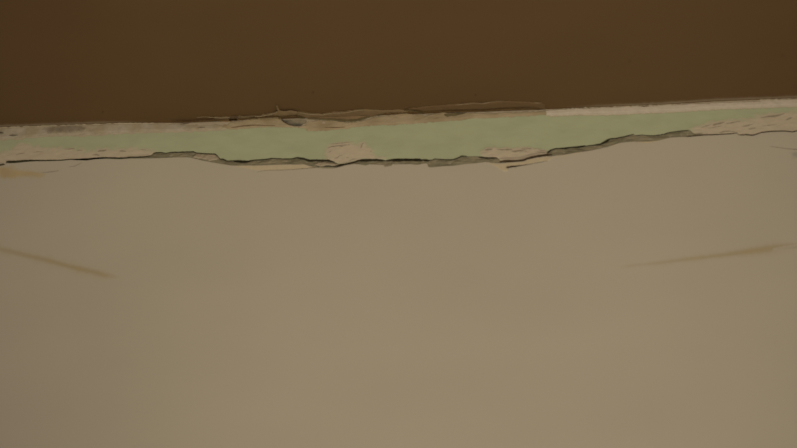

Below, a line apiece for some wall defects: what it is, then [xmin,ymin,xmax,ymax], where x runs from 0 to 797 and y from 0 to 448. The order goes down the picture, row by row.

spalling [0,101,797,172]